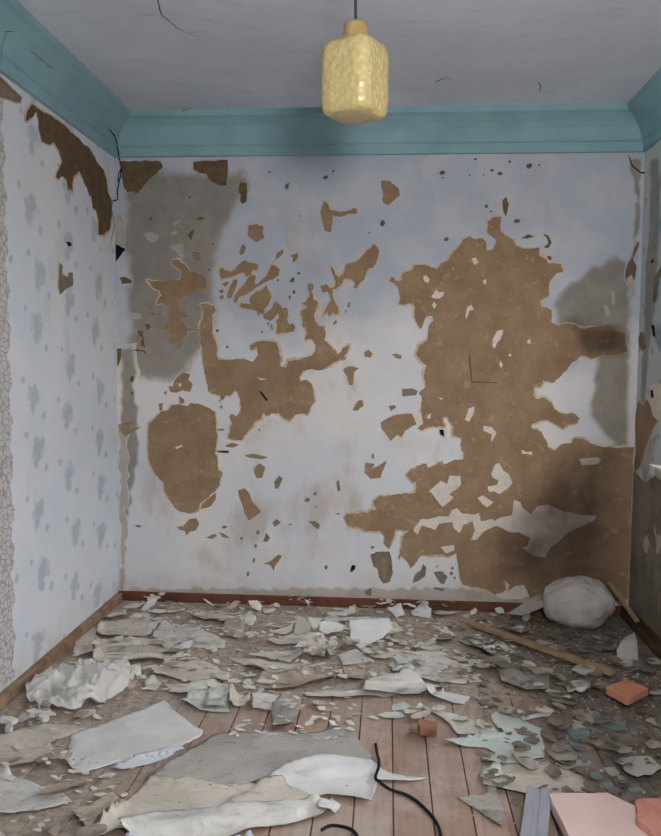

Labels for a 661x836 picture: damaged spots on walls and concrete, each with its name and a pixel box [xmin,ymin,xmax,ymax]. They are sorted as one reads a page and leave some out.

crack [107,127,122,251]
peeling [502,197,520,223]
peeling [219,280,237,299]
damp [544,150,661,446]
damp [115,157,531,603]
peeling [201,493,216,509]
peeling [246,454,267,478]
damp [525,495,593,570]
flaking render [628,470,661,638]